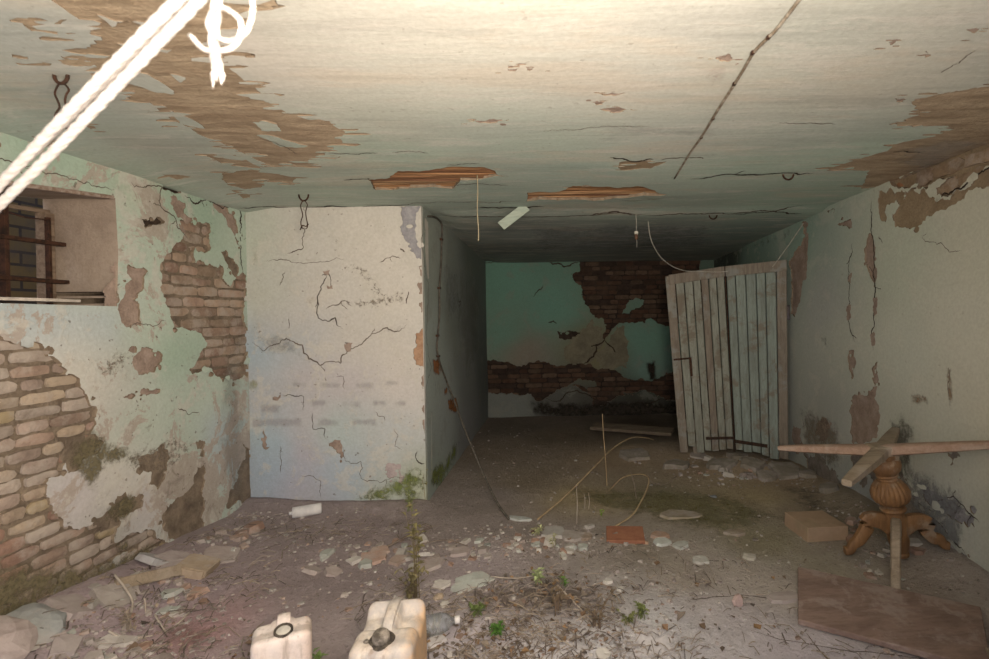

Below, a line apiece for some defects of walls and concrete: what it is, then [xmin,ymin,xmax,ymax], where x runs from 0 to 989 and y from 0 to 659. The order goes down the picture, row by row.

flaking render [11,0,167,74]
crack [0,158,285,274]
spalling [103,175,250,380]
flaking render [122,0,361,198]
crack [252,163,801,405]
spalling [487,260,709,406]
crack [610,157,809,179]
flaking render [817,87,989,233]
crack [941,167,989,197]
spalling [0,336,205,607]
crack [285,394,428,488]
leakage [899,455,961,543]